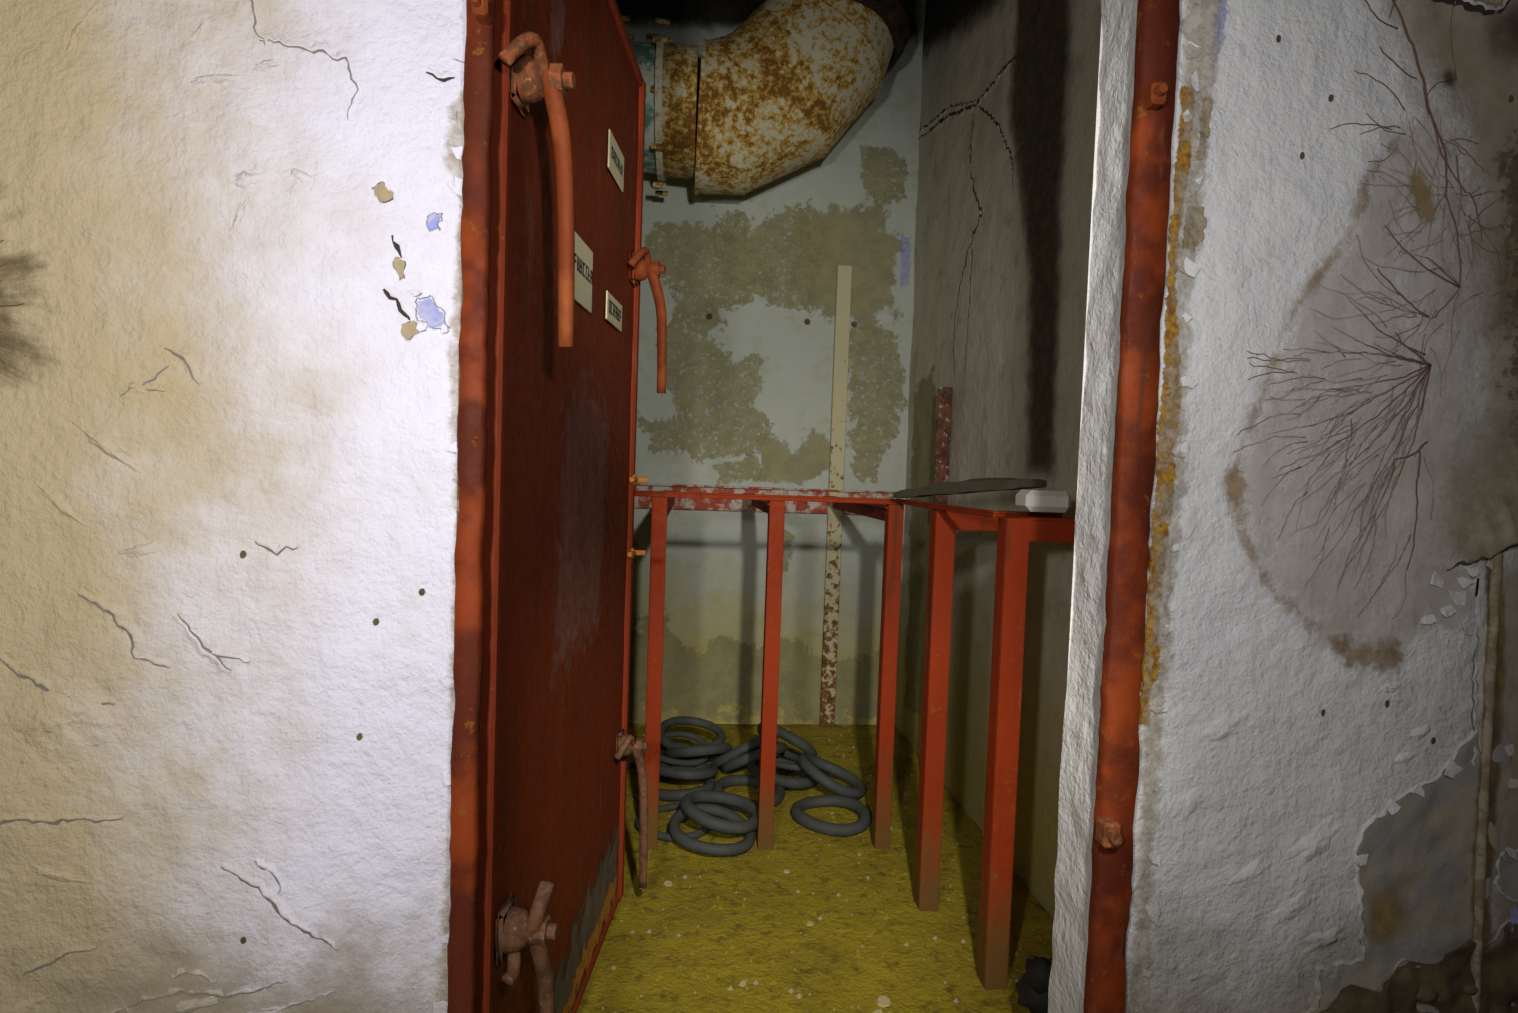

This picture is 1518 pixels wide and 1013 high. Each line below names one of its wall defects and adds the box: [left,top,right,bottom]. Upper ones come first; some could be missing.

crack [251,0,365,120]
crack [1431,0,1510,16]
leakage [0,240,29,370]
peeling [637,145,912,486]
leakage [1404,0,1518,480]
rust [1139,86,1195,725]
leakage [1226,468,1254,558]
leakage [1333,639,1401,669]
crack [0,813,122,825]
peeling [1305,728,1518,1013]